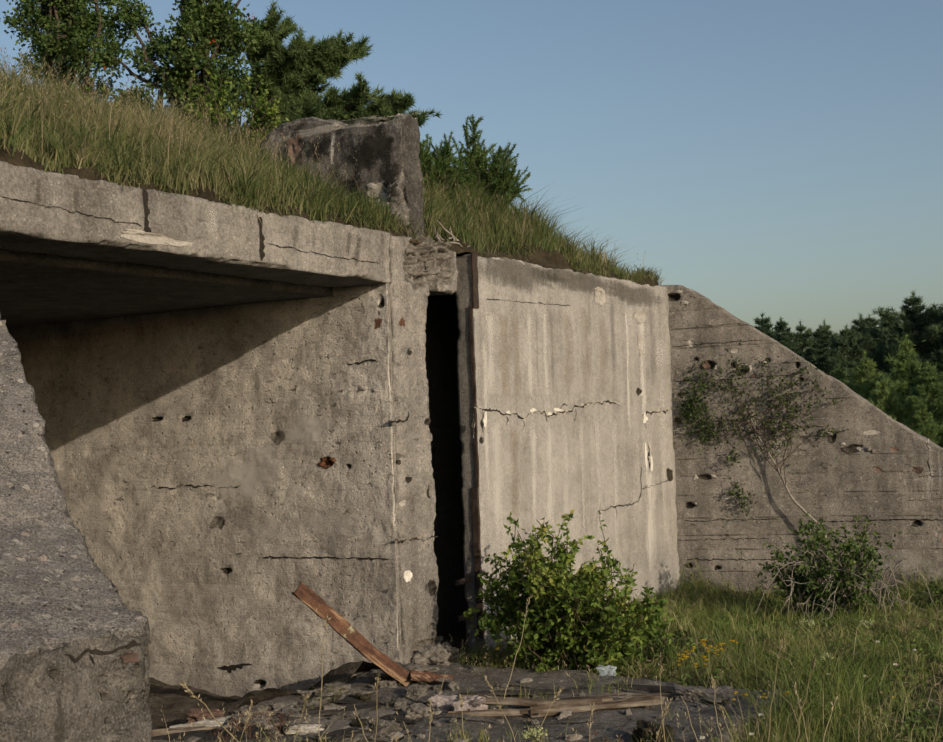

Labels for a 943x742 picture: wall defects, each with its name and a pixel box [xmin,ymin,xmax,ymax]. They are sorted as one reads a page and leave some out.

crack [1,196,141,226]
crack [268,243,378,263]
spalling [403,233,455,291]
leakage [483,317,493,412]
efflorescence [625,312,646,423]
crack [263,535,438,560]
leakage [485,424,501,528]
crack [472,399,821,520]
efflorescence [643,442,655,568]